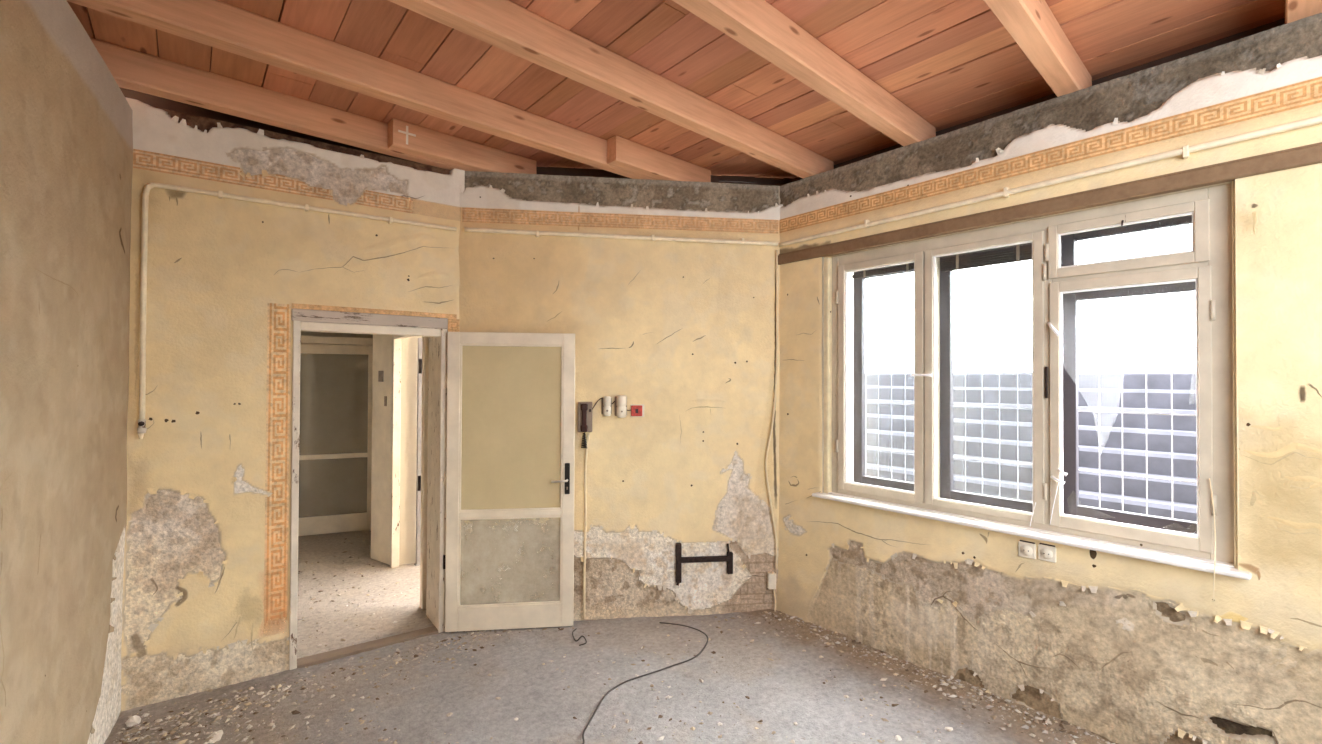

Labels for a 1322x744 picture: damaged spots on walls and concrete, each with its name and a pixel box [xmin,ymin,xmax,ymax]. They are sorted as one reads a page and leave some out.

flaking render [817,541,1320,744]